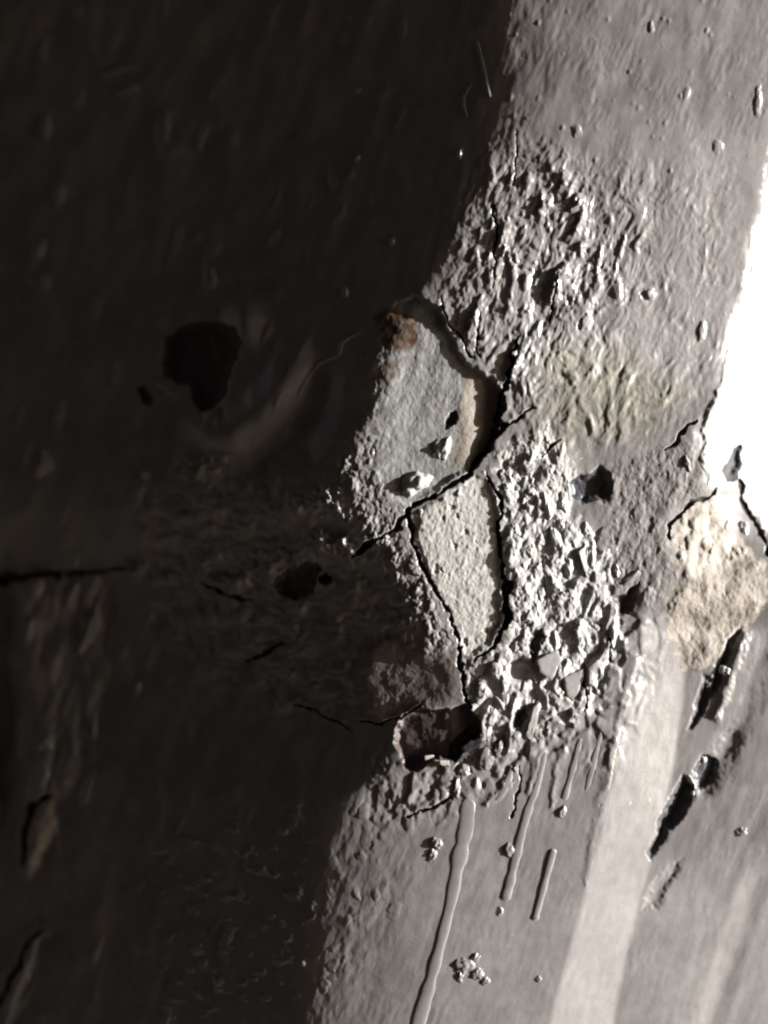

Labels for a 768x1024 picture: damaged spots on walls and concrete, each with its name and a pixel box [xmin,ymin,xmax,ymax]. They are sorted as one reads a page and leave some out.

rust [370,300,427,394]
crack [441,299,482,359]
crack [664,420,698,451]
crack [352,336,535,710]
spalling [329,162,768,830]
crack [666,479,768,557]
crack [0,567,139,588]
crack [293,704,423,732]
spalling [646,754,720,860]